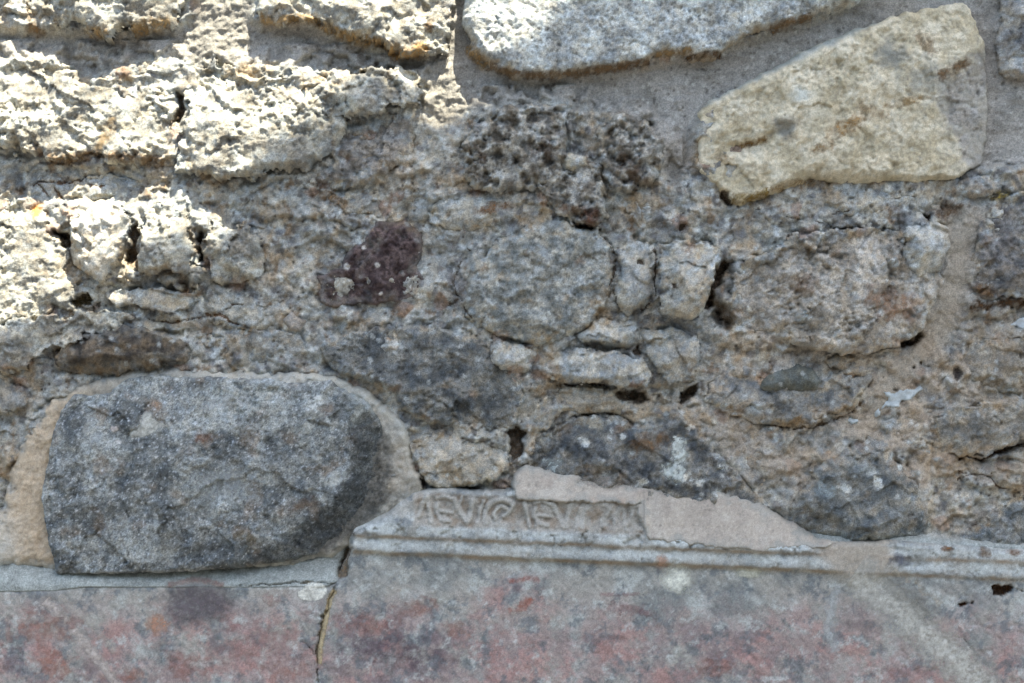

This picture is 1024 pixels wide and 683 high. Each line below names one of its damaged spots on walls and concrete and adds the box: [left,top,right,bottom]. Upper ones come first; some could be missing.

crack [309,615,324,682]